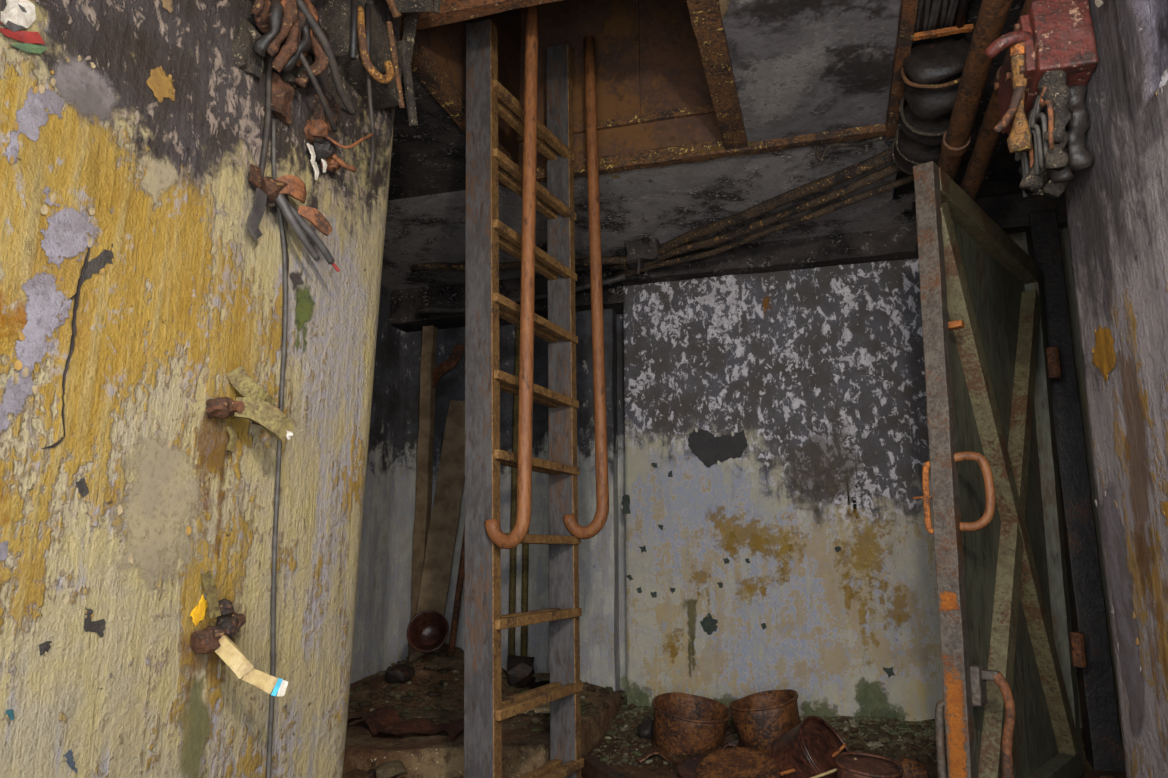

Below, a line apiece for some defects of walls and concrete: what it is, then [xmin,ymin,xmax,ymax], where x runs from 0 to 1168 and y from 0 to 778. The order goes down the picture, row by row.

peeling [147,66,175,103]
peeling [4,55,117,165]
peeling [0,186,115,433]
leakage [627,371,649,416]
leakage [777,332,803,420]
peeling [1092,325,1116,382]
spalling [688,427,748,468]
leakage [837,407,876,528]
spalling [84,607,106,638]
peeling [190,594,208,626]
spalling [700,613,718,635]
spalling [39,641,52,656]